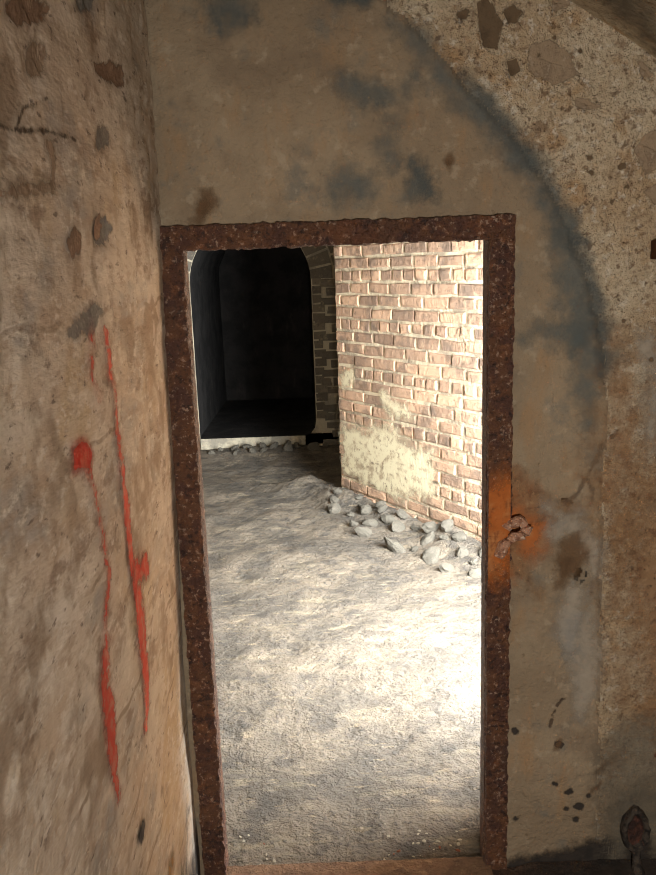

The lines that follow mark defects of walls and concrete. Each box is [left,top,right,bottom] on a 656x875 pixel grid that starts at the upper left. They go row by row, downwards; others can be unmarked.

water stain [415,36,614,426]
rust [488,470,571,581]
water stain [542,505,604,717]
water stain [181,811,201,875]
water stain [508,721,656,875]